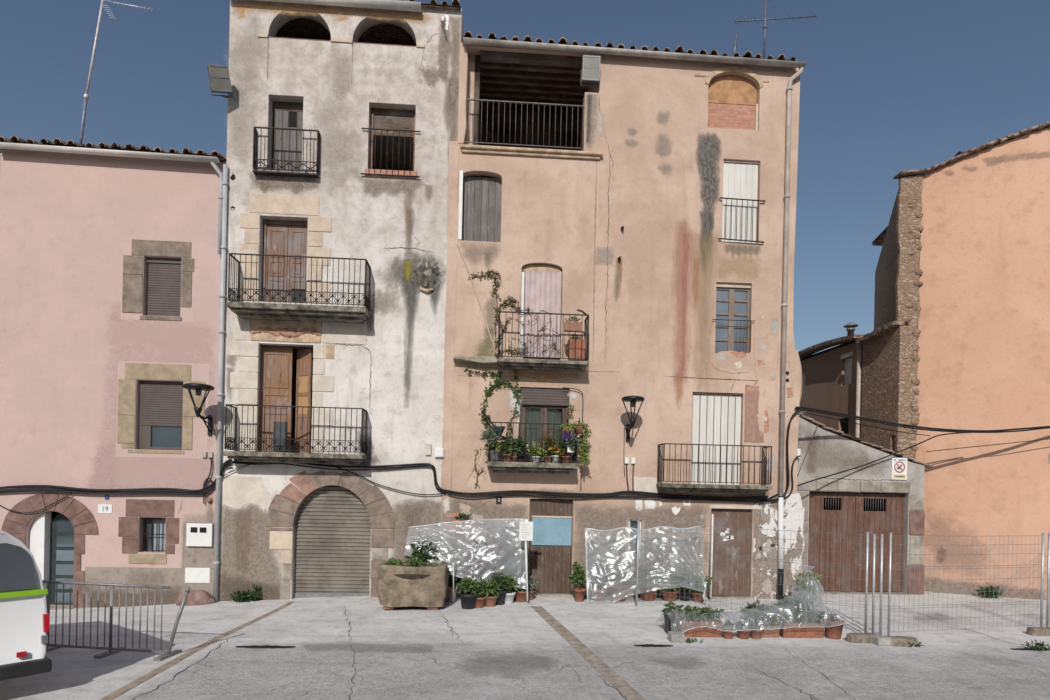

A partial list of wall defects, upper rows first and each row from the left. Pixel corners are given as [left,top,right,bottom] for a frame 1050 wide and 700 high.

leakage [364,179,439,389]
crack [581,98,614,372]
rust [677,226,691,377]
leakage [697,134,720,266]
spalling [710,316,780,474]
leakage [209,502,281,601]
peeling [635,499,691,515]
peeling [752,493,805,599]
crack [344,606,381,700]